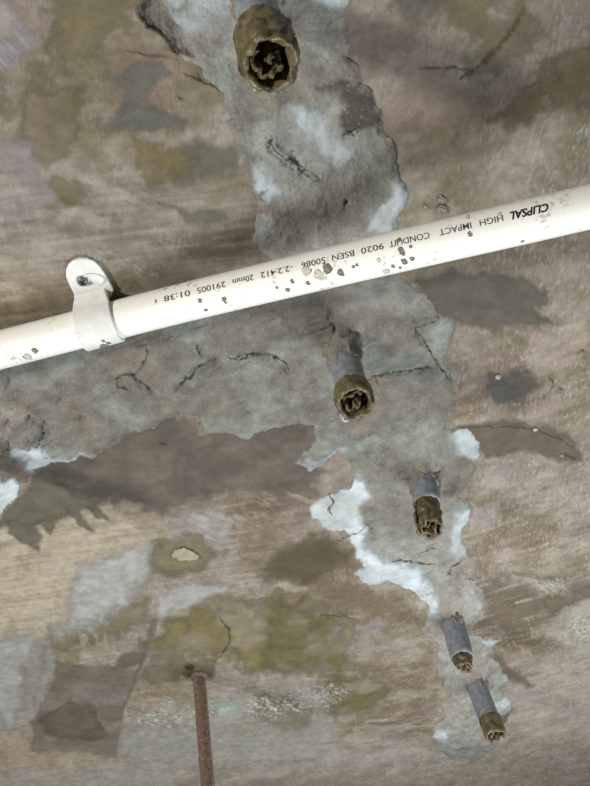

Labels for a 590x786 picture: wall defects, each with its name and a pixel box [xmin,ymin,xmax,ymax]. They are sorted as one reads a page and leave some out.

spalling [137,0,408,260]
leakage [439,0,542,78]
leakage [503,47,590,126]
leakage [0,638,38,728]
peeling [32,621,156,755]
peeling [171,547,199,561]
leakage [48,508,389,729]
leakage [310,479,439,619]